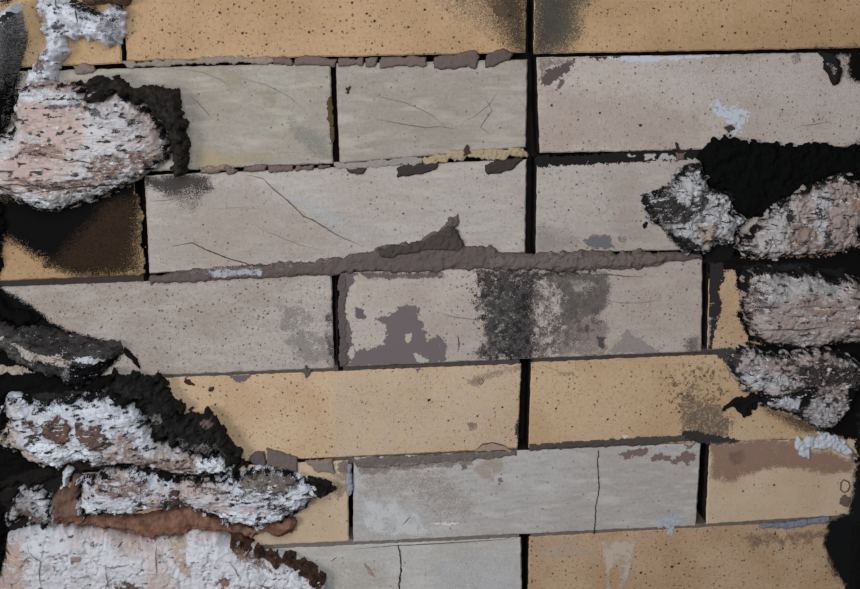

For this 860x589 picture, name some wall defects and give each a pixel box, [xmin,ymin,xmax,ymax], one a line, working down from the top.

water stain [739,367,857,460]
crack [592,450,600,534]
crack [359,517,513,589]